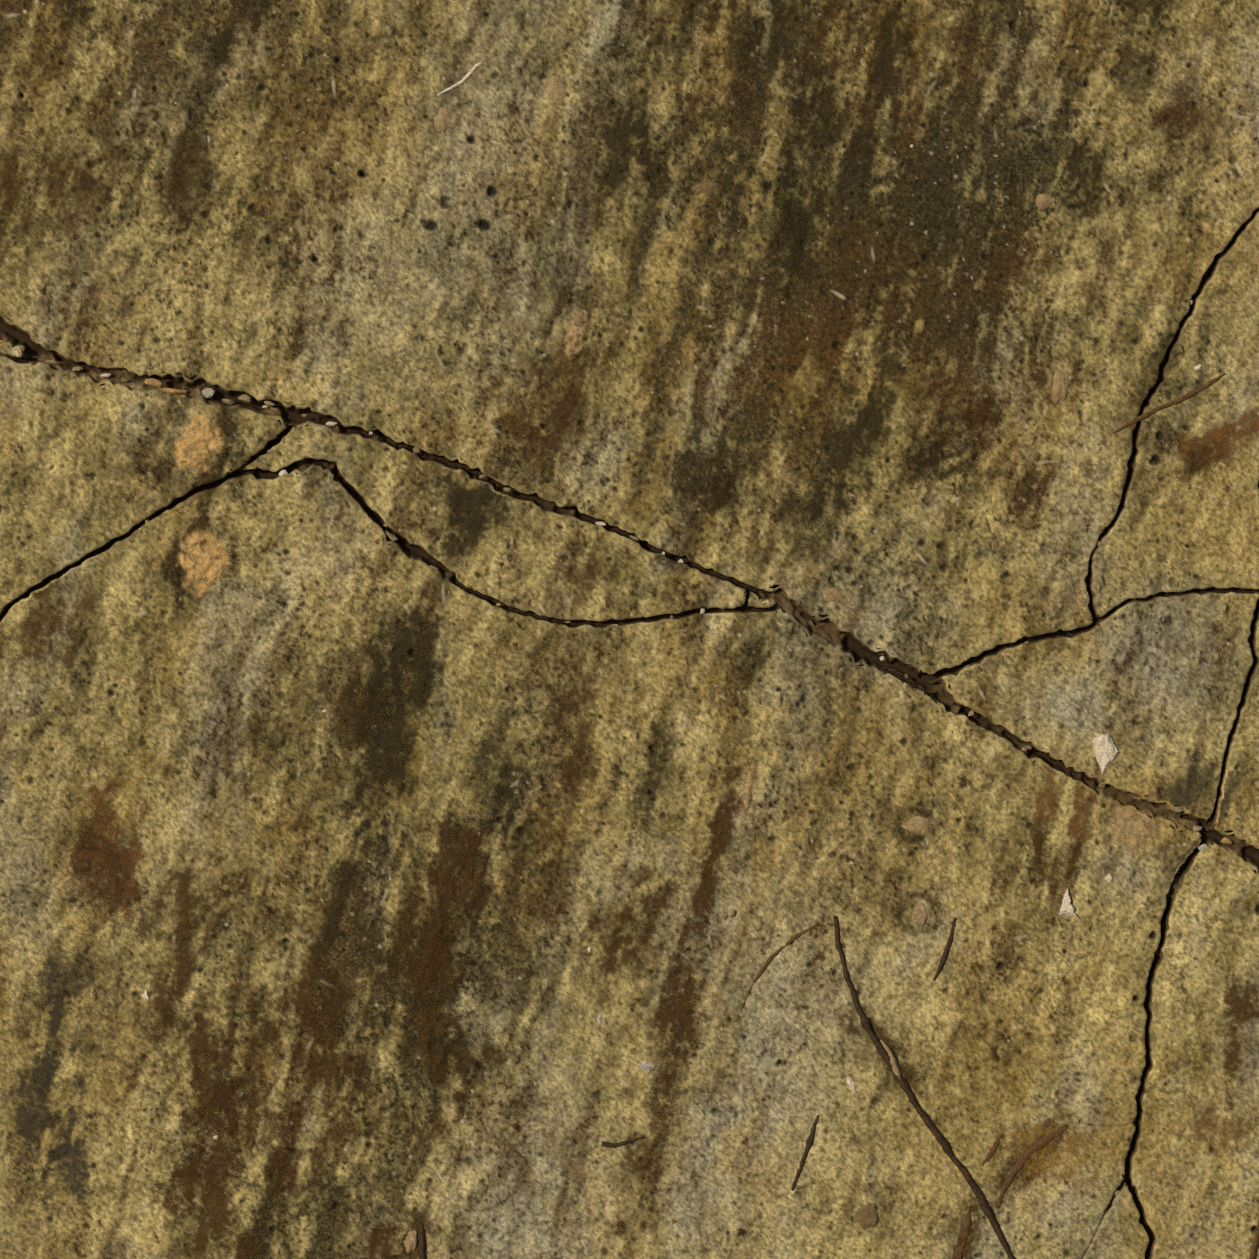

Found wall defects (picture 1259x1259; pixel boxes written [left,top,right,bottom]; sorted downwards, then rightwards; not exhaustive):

damp [600,91,663,202]
crack [1133,203,1259,419]
damp [435,467,509,557]
damp [780,349,897,554]
damp [907,394,1008,479]
corrosion [1176,412,1259,480]
damp [338,610,445,807]
crack [0,312,1259,1259]
damp [381,820,504,1085]
damp [579,868,674,977]
damp [654,766,743,1062]
damp [157,865,363,1259]